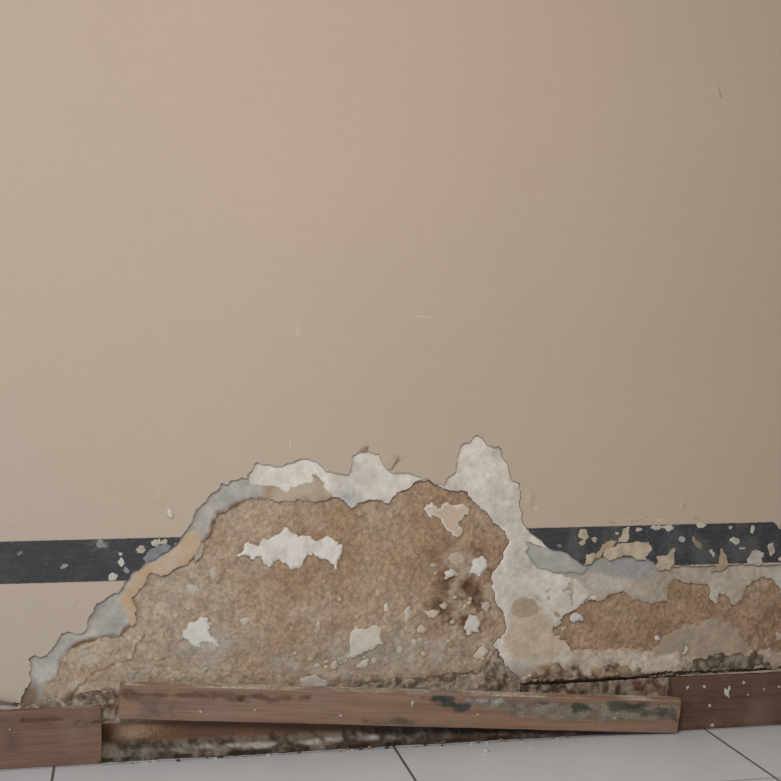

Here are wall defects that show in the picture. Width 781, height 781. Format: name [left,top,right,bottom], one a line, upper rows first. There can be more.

flaking render [0,435,781,763]